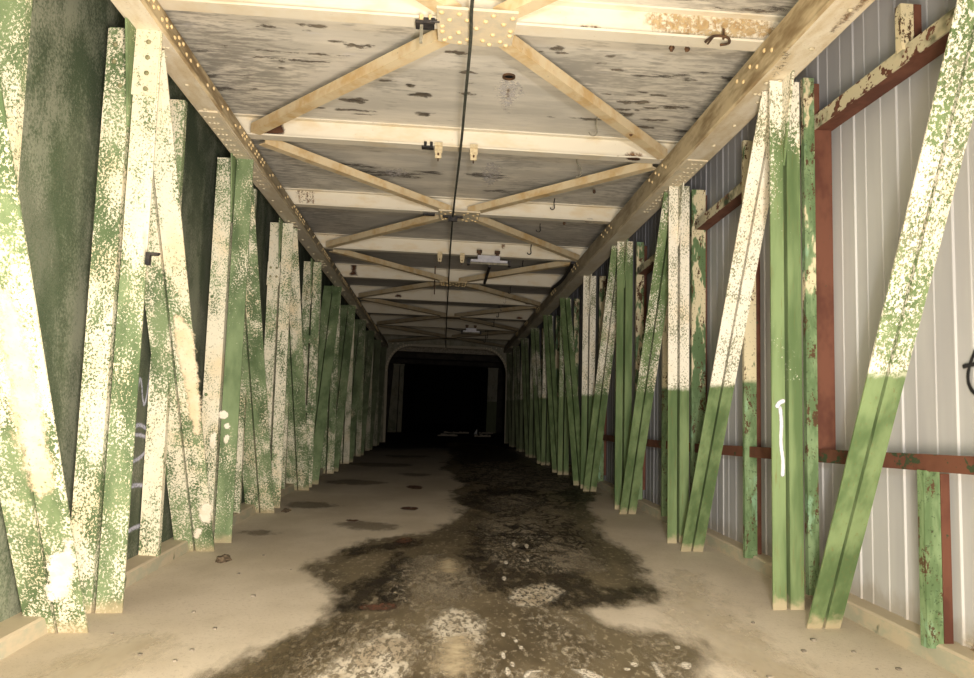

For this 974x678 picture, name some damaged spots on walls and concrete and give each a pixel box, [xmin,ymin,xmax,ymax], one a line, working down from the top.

peeling [0,288,55,499]
peeling [44,538,77,602]
leakage [213,442,703,678]